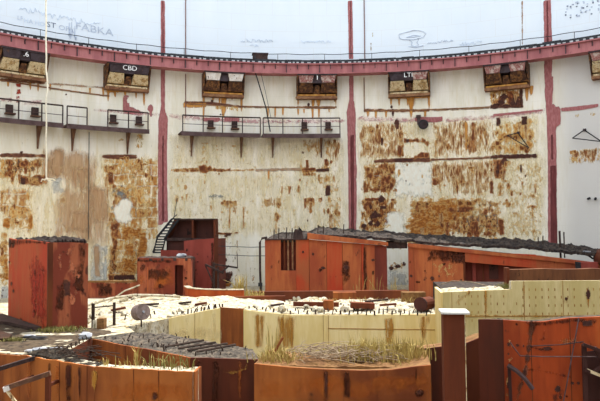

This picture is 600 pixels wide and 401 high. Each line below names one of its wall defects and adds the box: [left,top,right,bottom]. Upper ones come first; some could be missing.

rust [0,151,50,293]
rust [55,264,83,310]
damp [43,150,132,280]
rust [94,134,171,296]
rust [170,139,341,232]
rust [183,97,336,118]
rust [359,86,537,239]
rust [570,148,600,163]